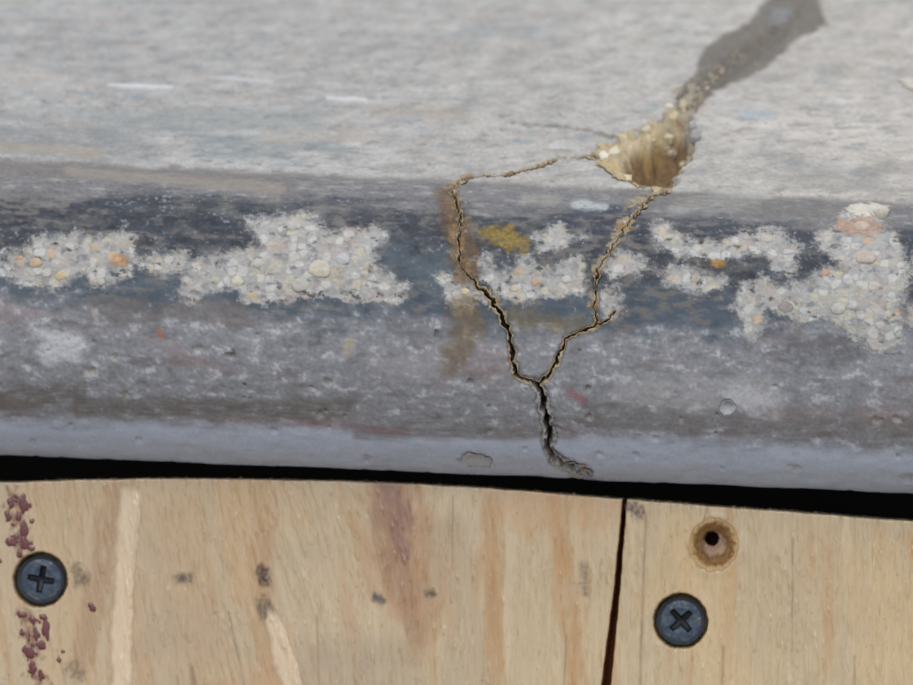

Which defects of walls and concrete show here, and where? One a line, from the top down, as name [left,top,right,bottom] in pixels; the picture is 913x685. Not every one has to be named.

leakage [676,0,827,118]
spalling [0,209,411,308]
spalling [432,220,592,316]
crack [448,135,671,479]
spalling [594,248,648,322]
spalling [648,202,913,360]